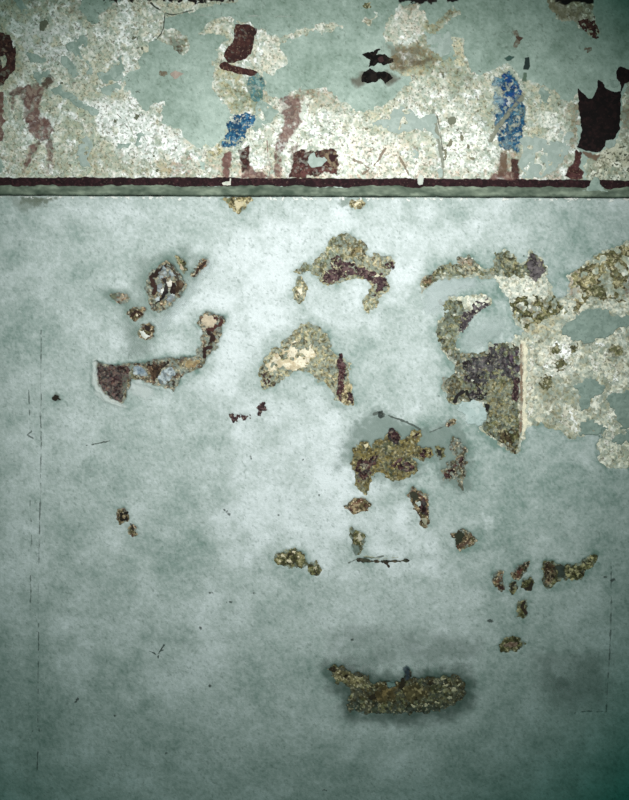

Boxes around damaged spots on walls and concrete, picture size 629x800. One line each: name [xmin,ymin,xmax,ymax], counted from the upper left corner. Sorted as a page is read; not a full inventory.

peeling [0,0,629,186]
spalling [109,255,210,340]
spalling [292,233,395,314]
spalling [92,311,226,407]
spalling [258,322,354,406]
peeling [521,341,580,436]
spalling [344,427,468,528]
spalling [274,548,322,576]
spalling [450,528,478,552]
spalling [492,554,598,619]
spalling [499,635,526,653]
spalling [327,664,466,716]